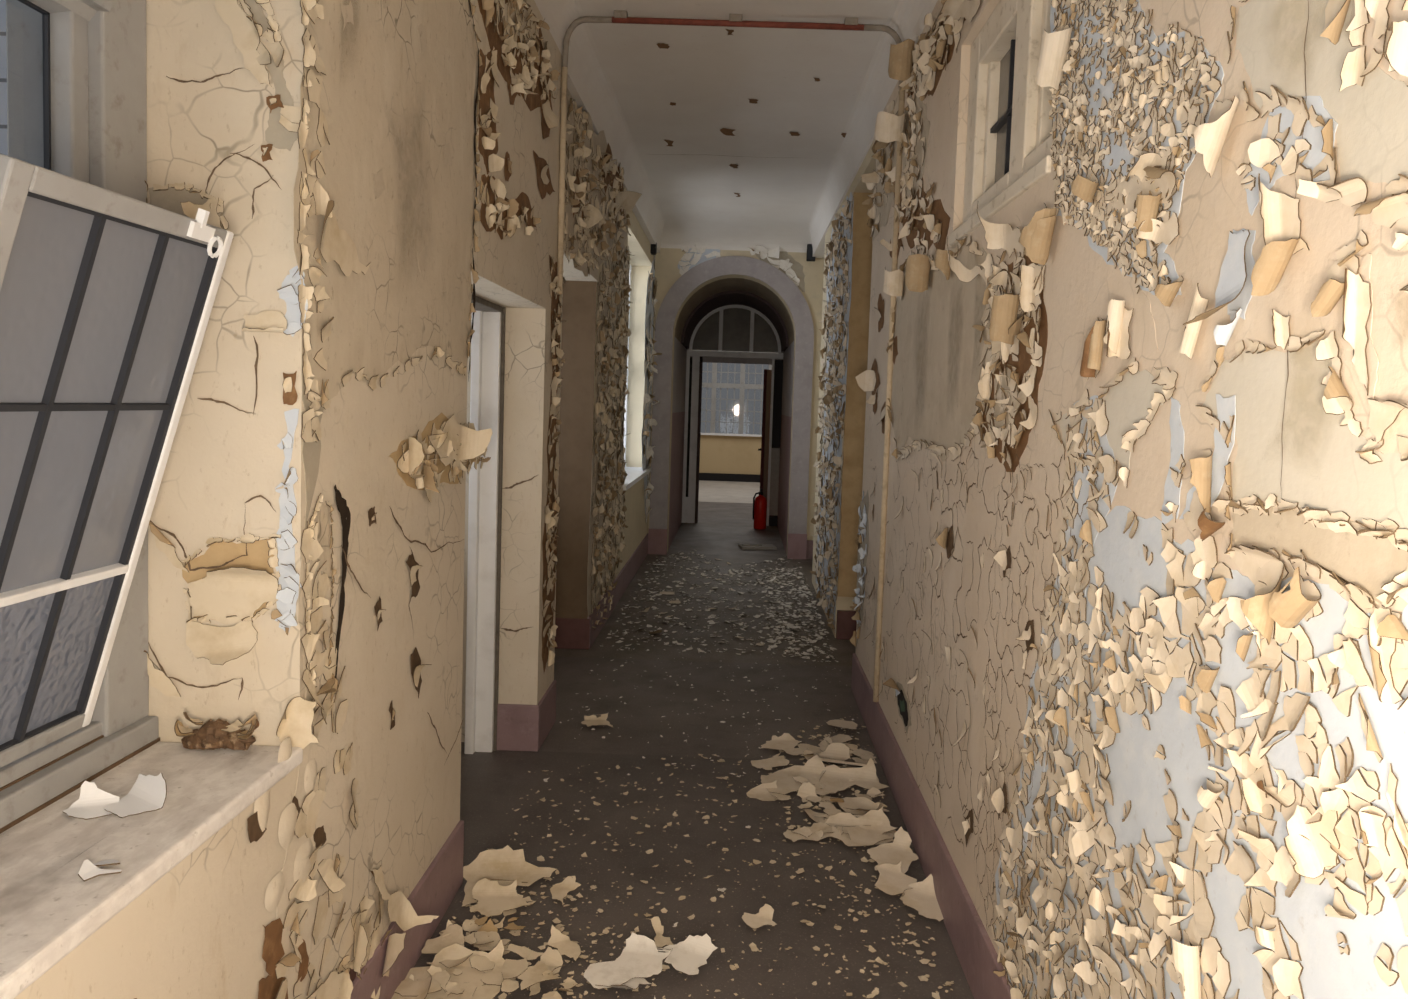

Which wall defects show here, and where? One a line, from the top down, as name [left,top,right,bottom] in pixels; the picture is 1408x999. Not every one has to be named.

crack [166,68,241,83]
crack [205,145,281,218]
crack [468,0,479,372]
crack [334,485,371,694]
crack [389,506,464,553]
peeling [144,0,854,999]
peeling [850,491,869,648]
peeling [855,0,1408,999]
crack [427,712,463,758]
crack [857,448,1097,984]
peeling [614,702,944,999]